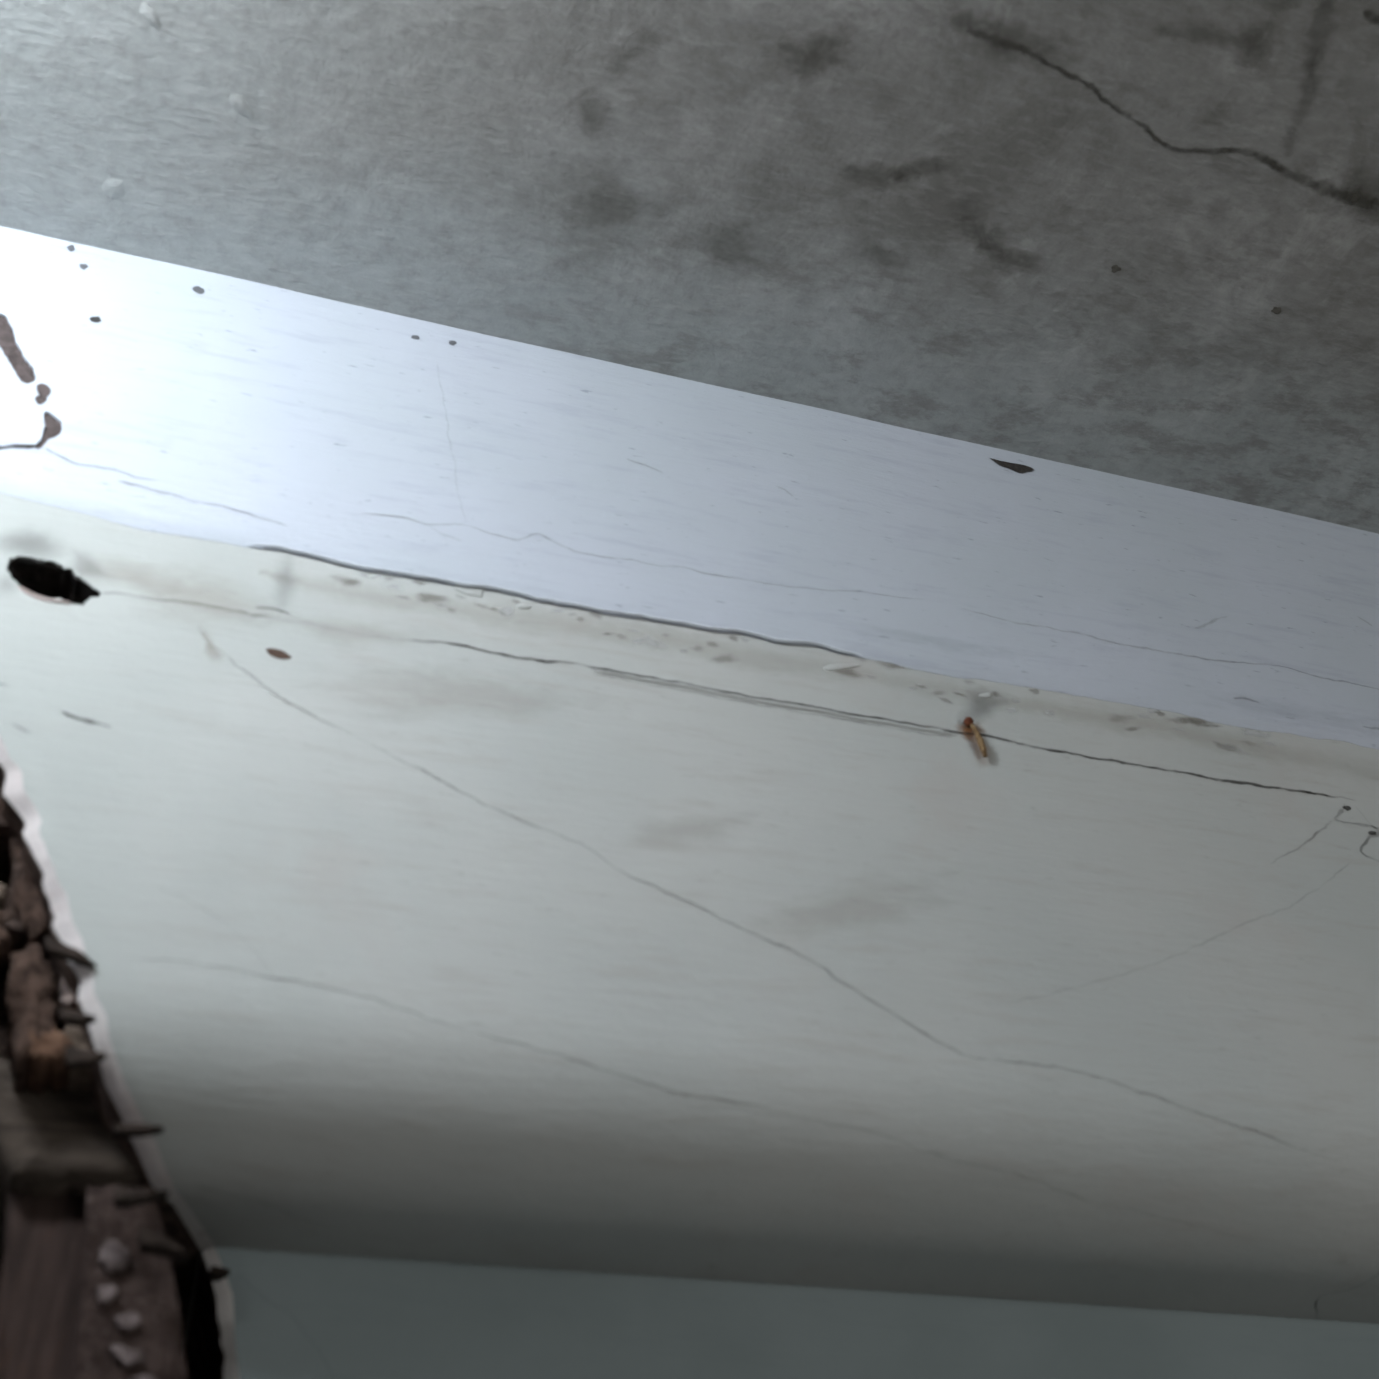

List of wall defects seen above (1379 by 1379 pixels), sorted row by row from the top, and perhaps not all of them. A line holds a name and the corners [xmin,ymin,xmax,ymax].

peeling [97,1239,155,1379]